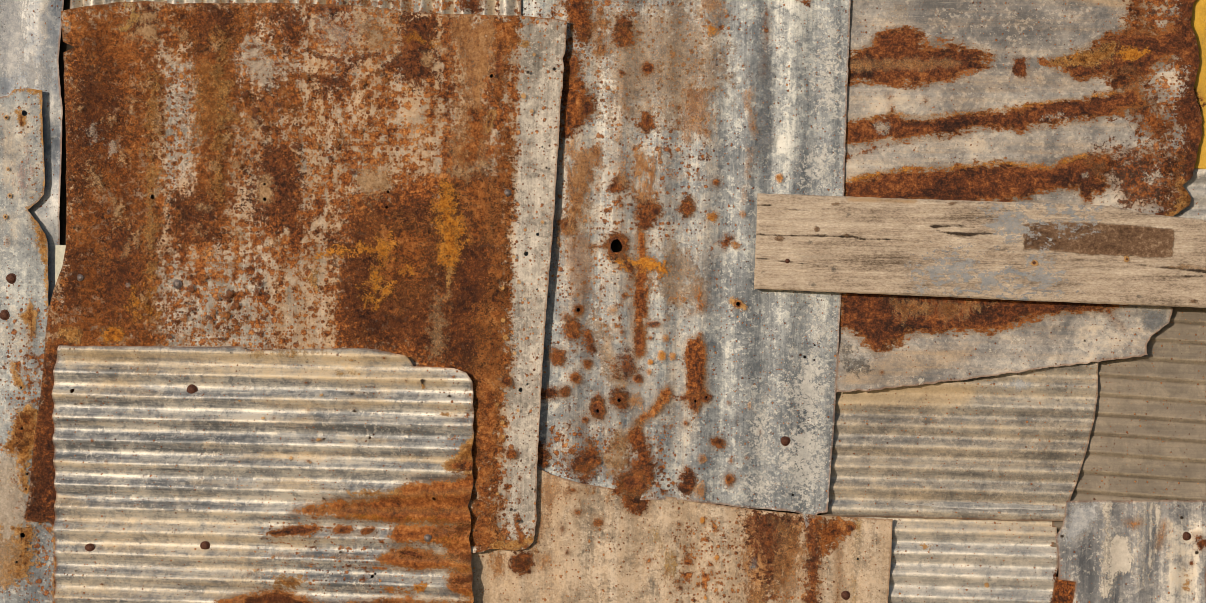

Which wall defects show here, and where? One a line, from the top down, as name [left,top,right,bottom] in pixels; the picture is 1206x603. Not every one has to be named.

corrosion [844,0,1206,217]
corrosion [0,0,536,603]
corrosion [728,297,748,310]
corrosion [839,293,1128,374]
corrosion [710,436,748,486]
corrosion [487,512,550,579]
corrosion [736,508,859,603]